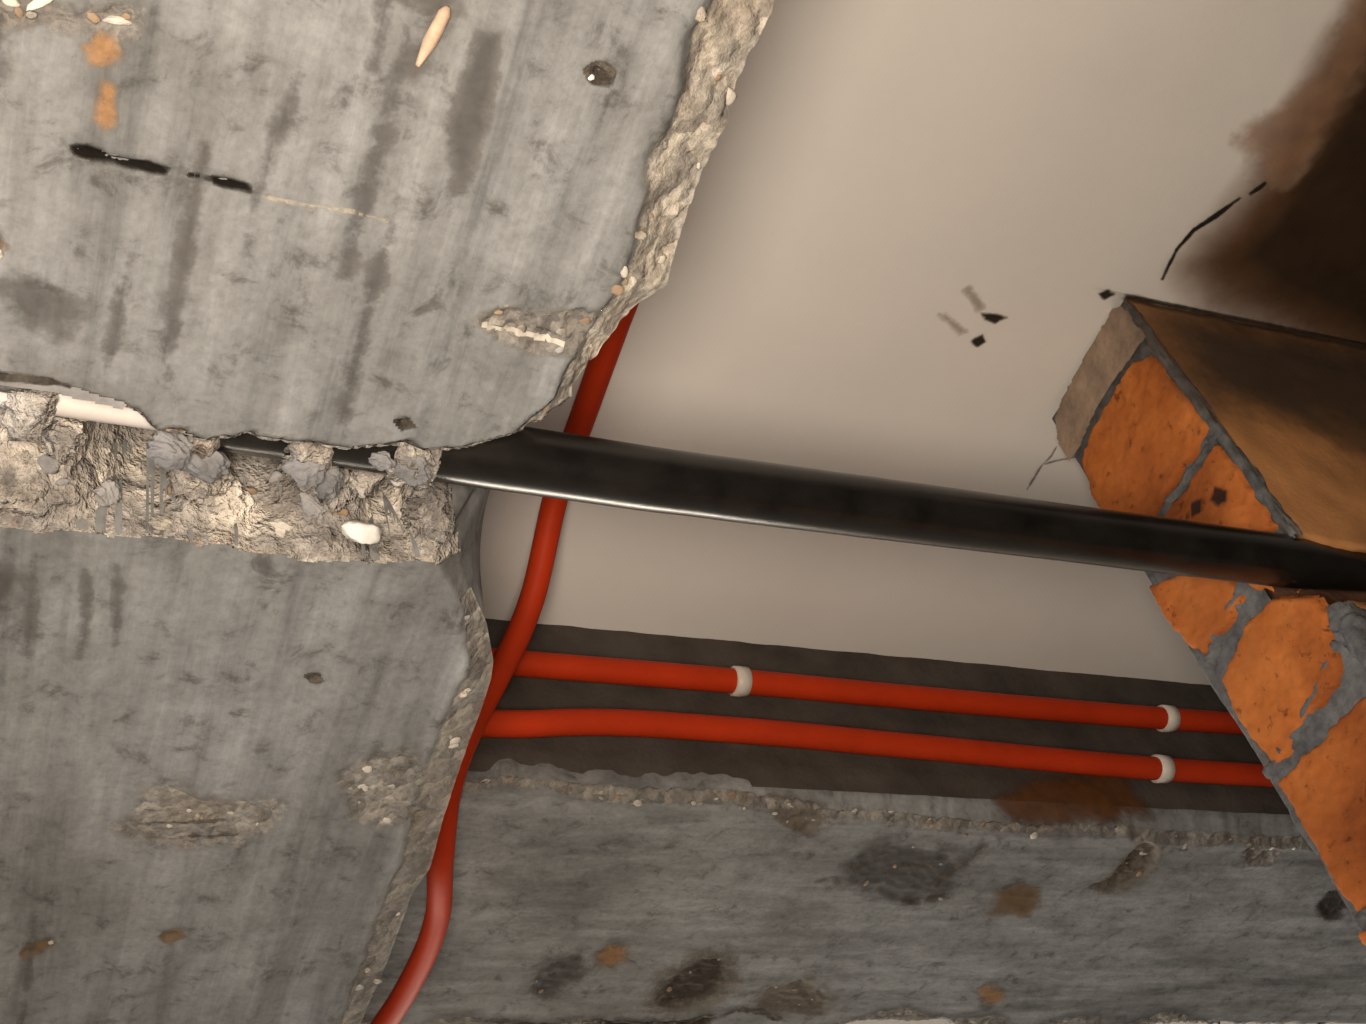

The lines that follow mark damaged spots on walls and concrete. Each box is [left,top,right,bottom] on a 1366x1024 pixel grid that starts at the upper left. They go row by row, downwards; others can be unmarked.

rust [83,34,121,66]
rust [95,83,116,128]
crack [187,172,212,181]
crack [266,196,386,220]
damp [1187,0,1366,343]
spalling [0,0,775,565]
crack [1125,182,1366,348]
spalling [110,781,287,849]
spalling [339,588,1314,1024]